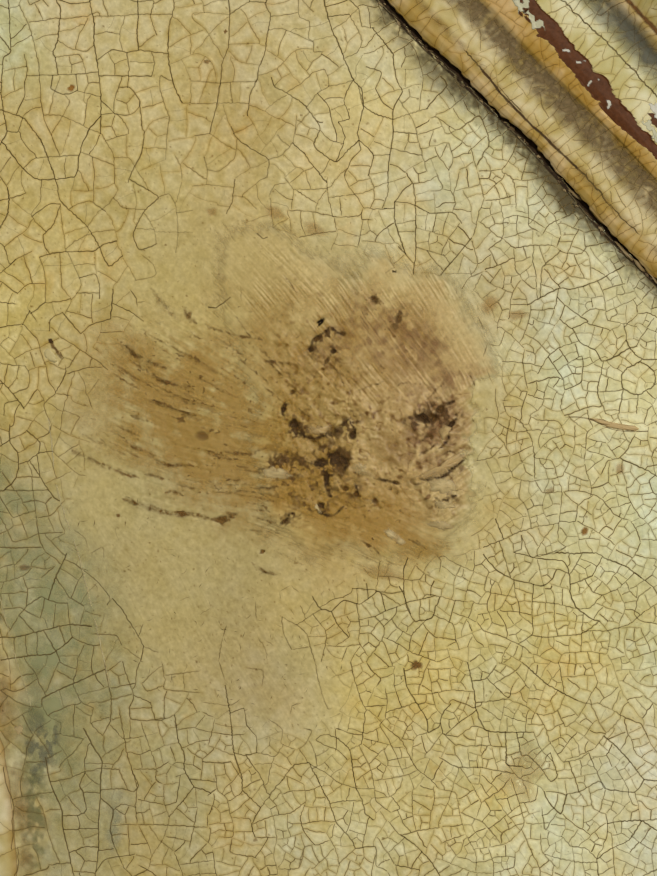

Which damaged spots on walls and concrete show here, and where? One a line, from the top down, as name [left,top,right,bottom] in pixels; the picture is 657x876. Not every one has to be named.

crack [0,187,80,337]
crack [0,0,183,266]
crack [293,0,657,414]
peeling [513,0,657,159]
crack [0,425,59,502]
damp [116,352,430,554]
crack [483,519,657,637]
crack [45,728,121,876]
crack [165,685,261,836]
crack [293,694,375,849]
crack [312,558,657,814]
crack [573,817,657,876]